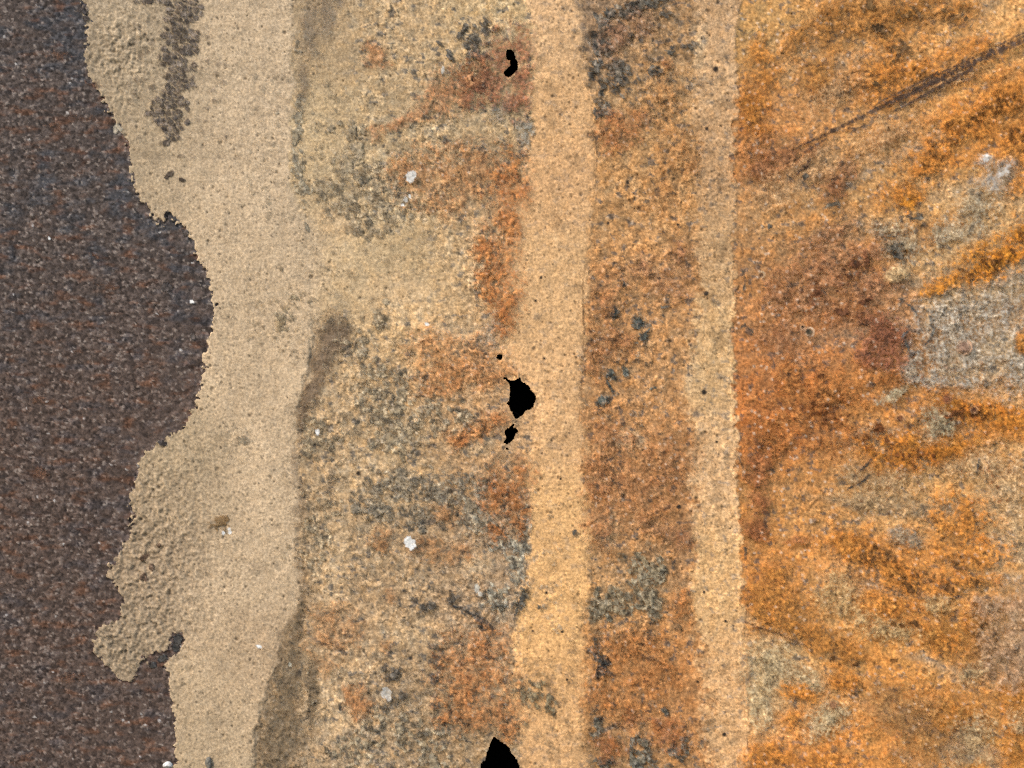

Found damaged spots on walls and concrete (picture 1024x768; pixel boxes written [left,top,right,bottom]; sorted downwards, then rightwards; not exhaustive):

corrosion [369,24,534,142]
corrosion [596,82,699,215]
corrosion [736,0,991,183]
corrosion [875,64,1024,214]
corrosion [386,140,532,398]
peeling [0,0,218,768]
leakage [297,317,350,432]
corrosion [739,215,1024,542]
corrosion [580,407,694,550]
corrosion [432,622,525,741]
corrosion [580,630,685,752]
corrosion [737,490,1024,768]